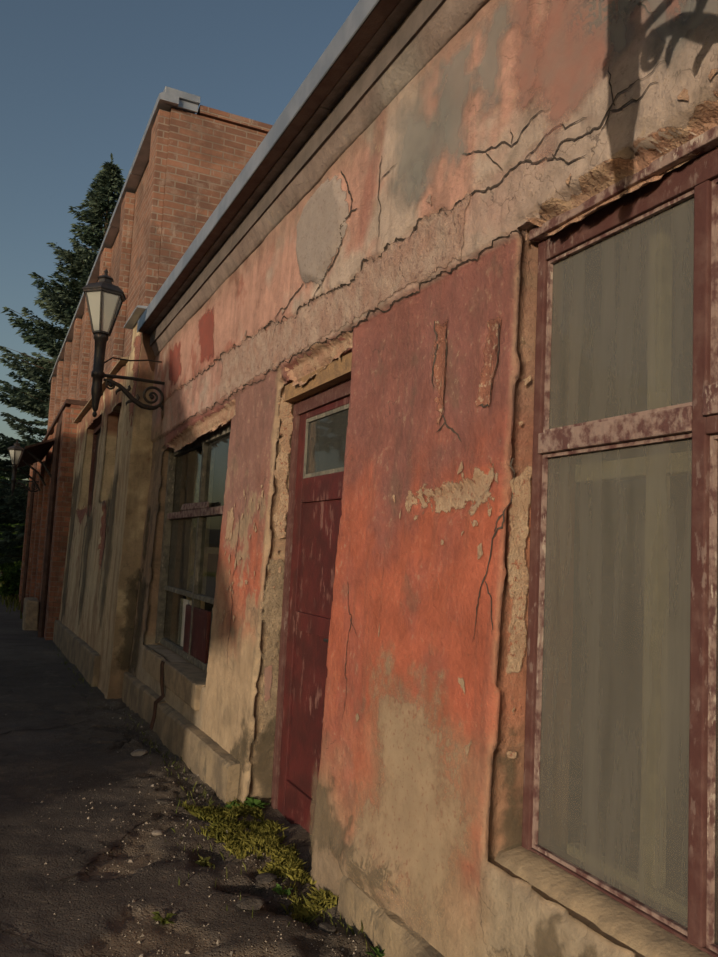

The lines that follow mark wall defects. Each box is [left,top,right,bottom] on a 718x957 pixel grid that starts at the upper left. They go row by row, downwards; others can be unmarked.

crack [167,61,662,434]
peeling [169,342,181,384]
crack [437,407,461,441]
flaking render [392,462,498,536]
peeling [506,466,532,673]
peeling [256,549,285,747]
damp [310,776,351,855]